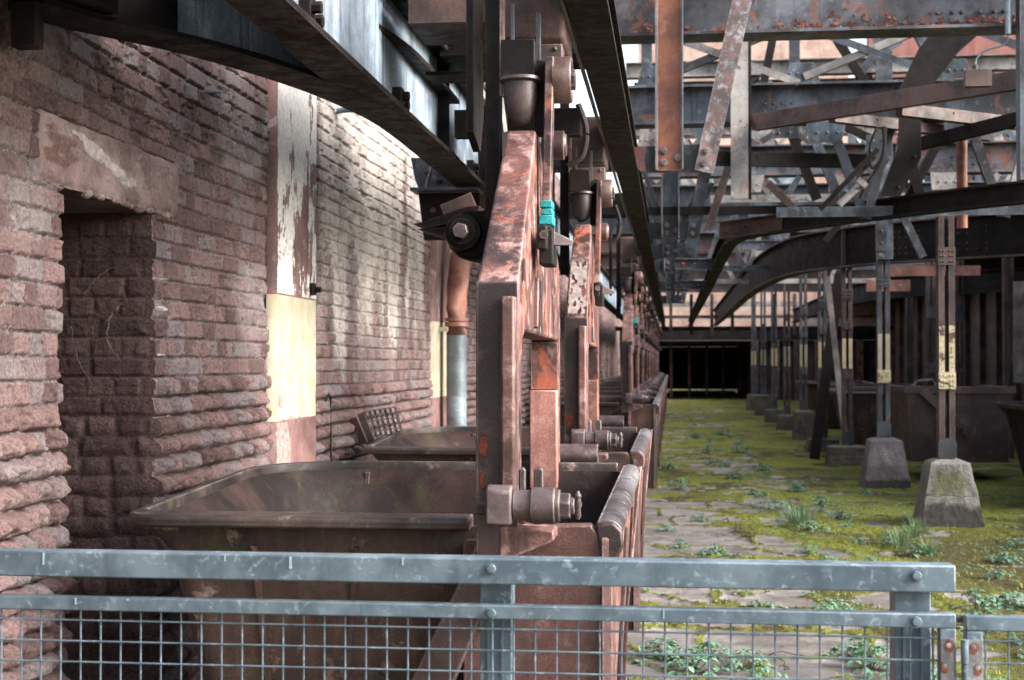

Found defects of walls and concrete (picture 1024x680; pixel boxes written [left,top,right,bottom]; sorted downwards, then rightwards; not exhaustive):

corrosion [745,7,1015,30]
peeling [277,82,317,299]